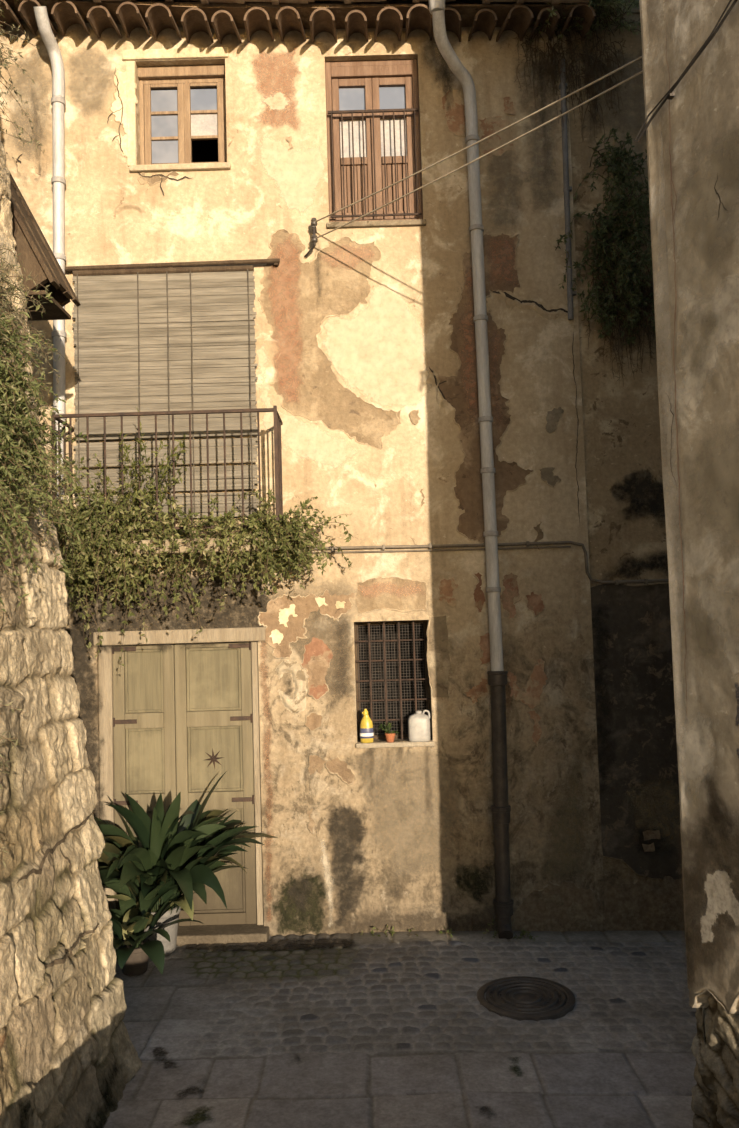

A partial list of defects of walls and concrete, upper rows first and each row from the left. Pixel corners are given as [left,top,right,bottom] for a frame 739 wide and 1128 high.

crack [107,68,188,195]
spalling [252,49,298,151]
spalling [257,228,421,450]
spalling [436,232,564,544]
crack [490,289,580,522]
spalling [257,571,491,731]
spalling [500,572,545,620]
leakage [682,715,739,975]
spalling [701,870,739,943]
spalling [690,990,739,1128]